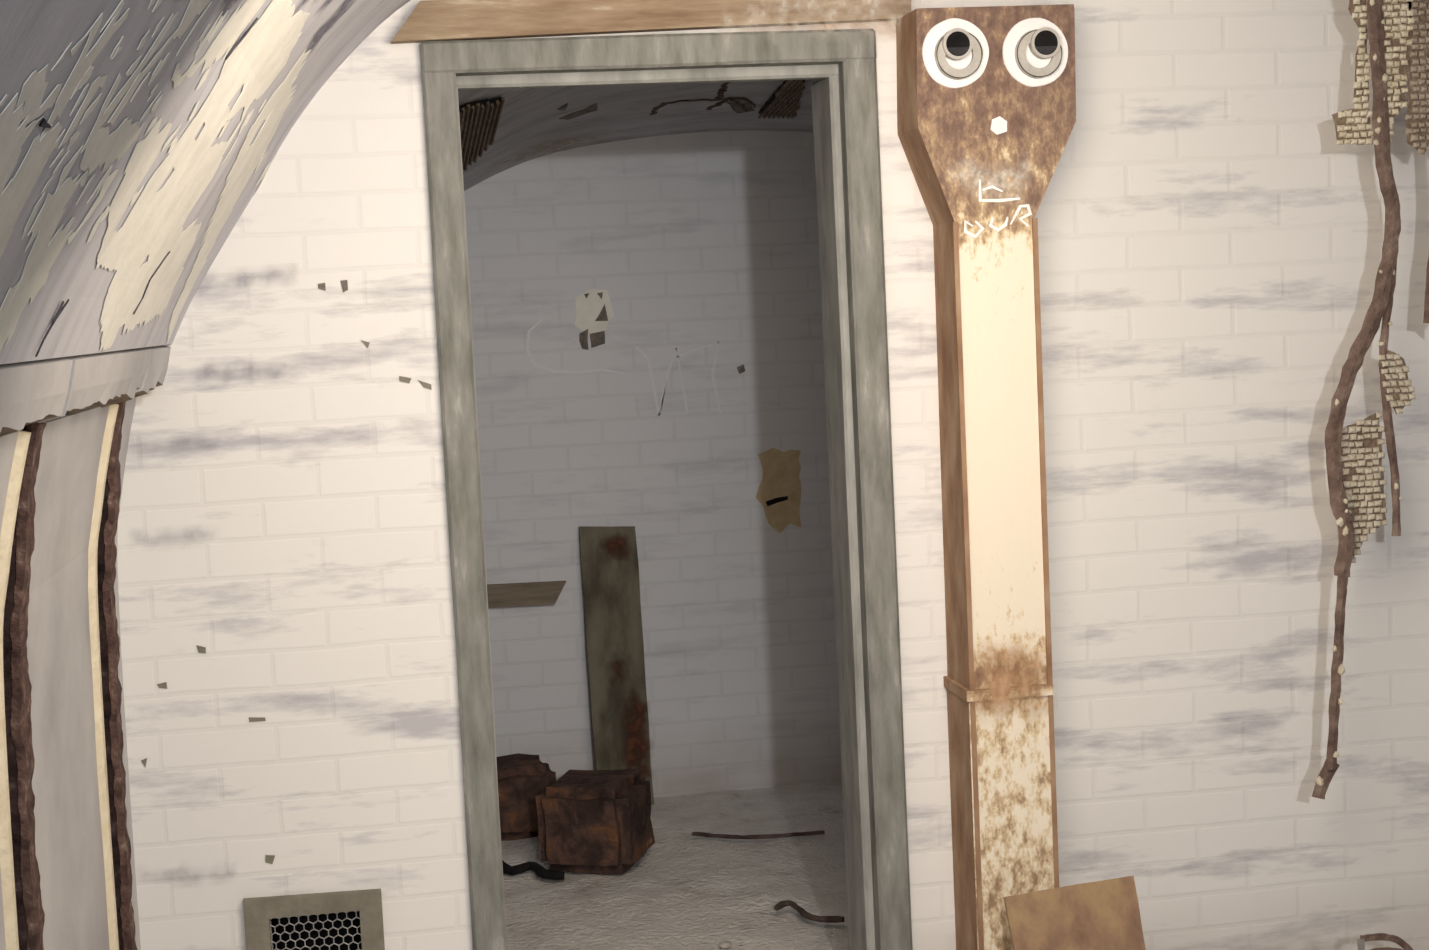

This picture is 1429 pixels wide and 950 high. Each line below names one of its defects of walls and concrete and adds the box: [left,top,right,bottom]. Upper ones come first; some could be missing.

flaking render [557,103,598,120]
peeling [0,0,312,351]
flaking render [318,280,348,292]